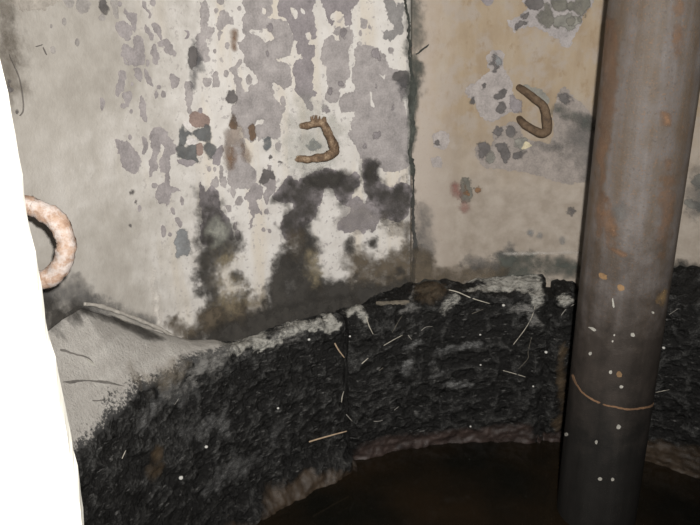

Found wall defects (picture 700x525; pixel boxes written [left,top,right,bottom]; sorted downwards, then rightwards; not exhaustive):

peeling [98,0,410,233]
leakage [392,56,421,155]
crack [404,0,429,124]
peeling [465,50,596,185]
peeling [507,0,594,48]
leakage [43,278,161,339]
leakage [169,159,581,356]
crack [408,141,449,291]